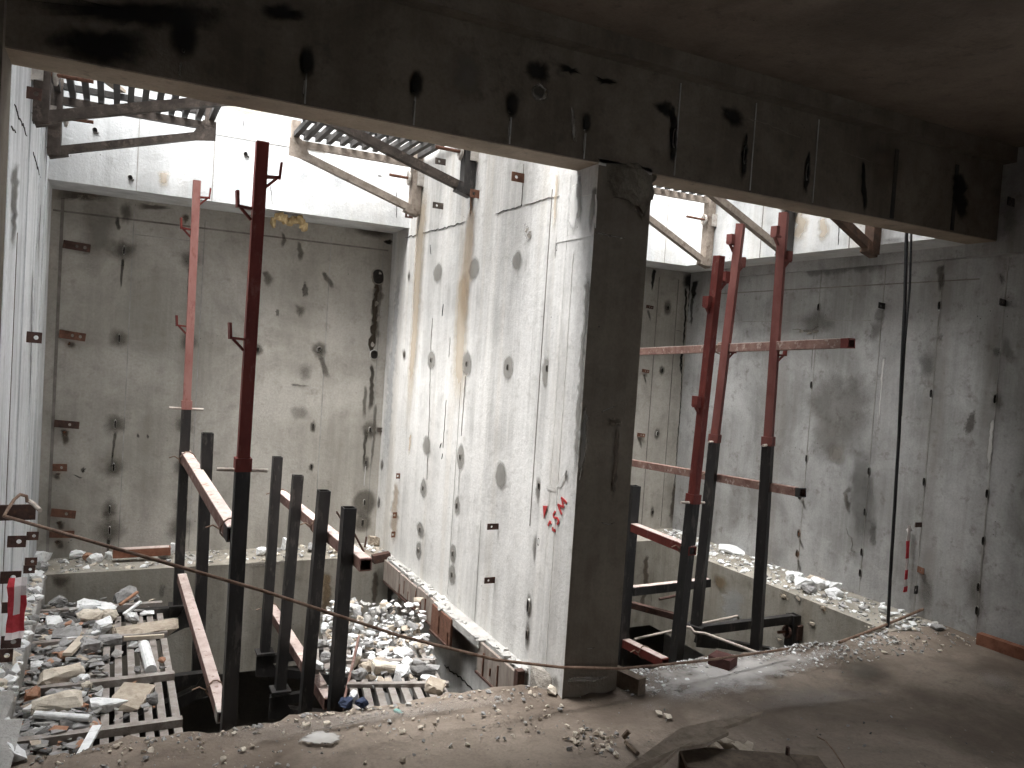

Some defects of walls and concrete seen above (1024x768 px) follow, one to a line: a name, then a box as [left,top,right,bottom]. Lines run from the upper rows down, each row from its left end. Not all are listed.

leakage [655,101,677,161]
crack [379,175,465,254]
crack [495,164,558,214]